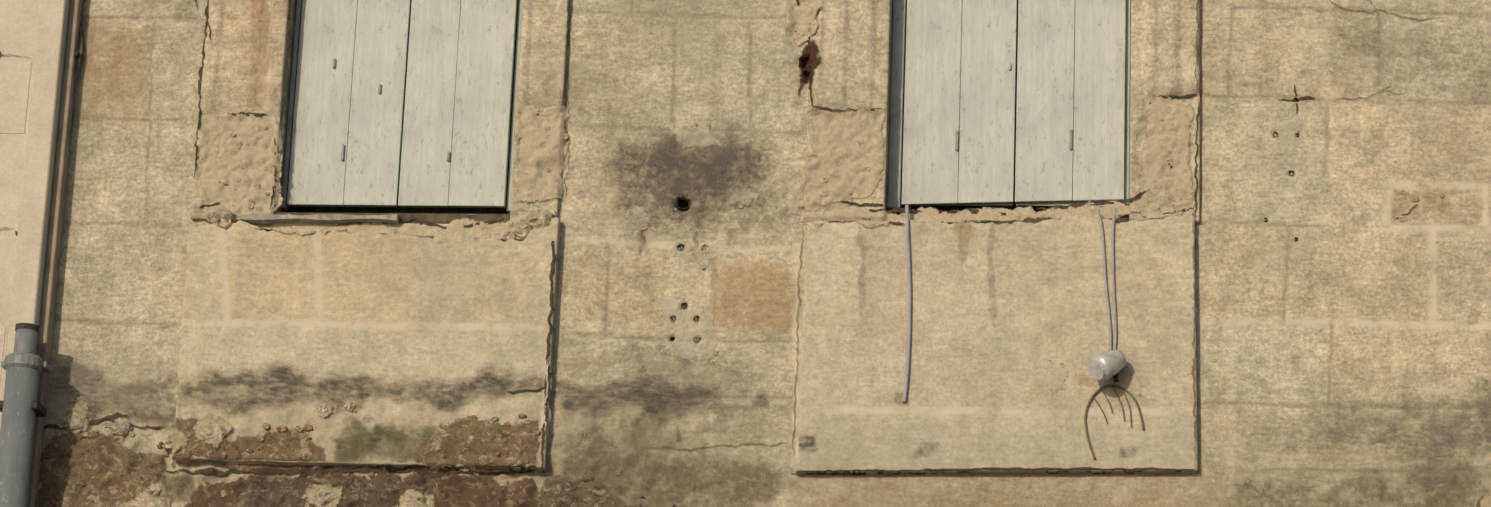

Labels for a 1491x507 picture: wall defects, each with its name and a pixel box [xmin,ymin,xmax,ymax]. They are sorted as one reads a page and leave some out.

rust [798,41,820,83]
crack [166,0,571,505]
crack [43,412,164,439]
peeling [38,414,644,507]